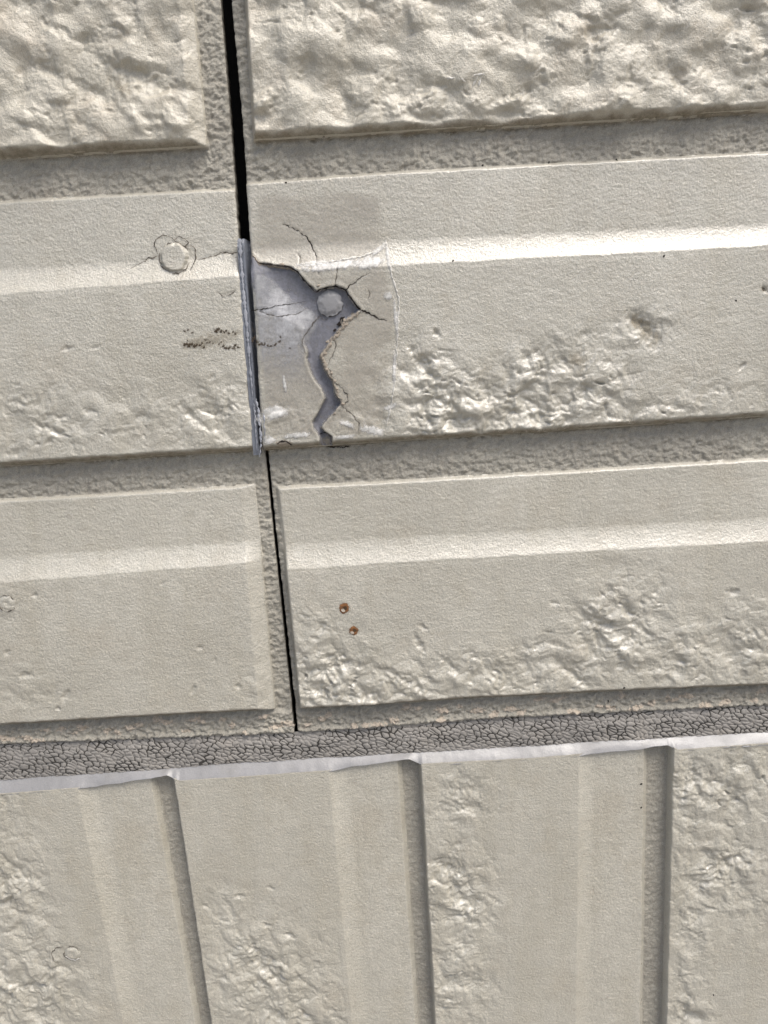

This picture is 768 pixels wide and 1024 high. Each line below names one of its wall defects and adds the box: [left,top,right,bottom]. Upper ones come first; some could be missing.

crack [283,224,387,321]
spalling [251,255,360,448]
crack [0,704,768,780]